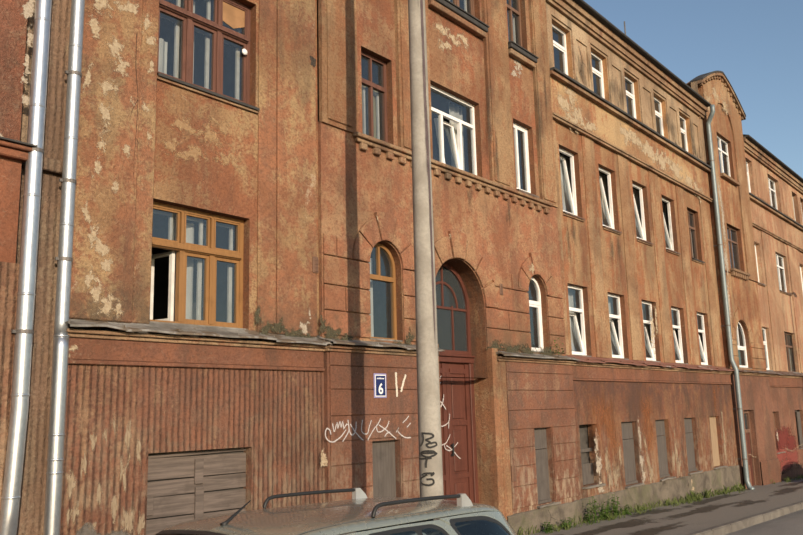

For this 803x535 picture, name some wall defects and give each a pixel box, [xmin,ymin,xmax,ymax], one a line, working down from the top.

flaking render [89,0,156,45]
flaking render [436,24,469,51]
flaking render [83,39,130,177]
flaking render [555,85,596,133]
flaking render [620,124,703,204]
flaking render [81,201,122,317]
water stain [255,305,353,341]
flaking render [67,420,145,535]
flaking render [593,428,622,493]
flaking render [638,420,653,483]